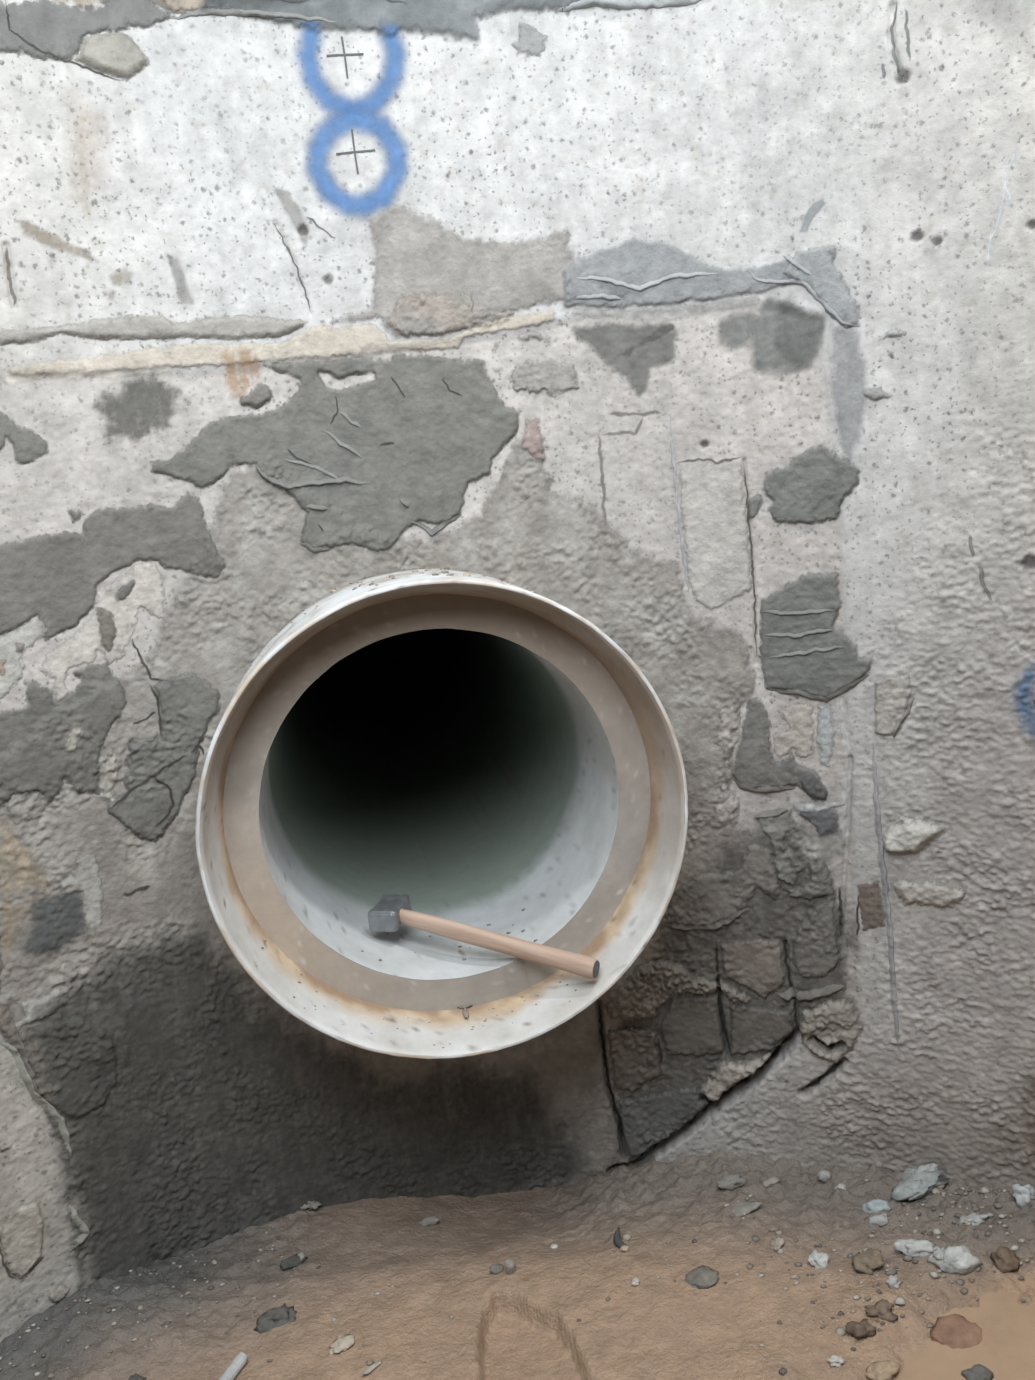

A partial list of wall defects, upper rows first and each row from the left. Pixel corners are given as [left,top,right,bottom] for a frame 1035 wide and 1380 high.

peeling [161,0,206,12]
peeling [74,30,150,80]
spalling [65,728,84,752]
spalling [99,751,121,801]
spalling [7,793,48,825]
crack [715,947,728,1043]
crack [784,941,798,1026]
crack [599,1009,623,1143]